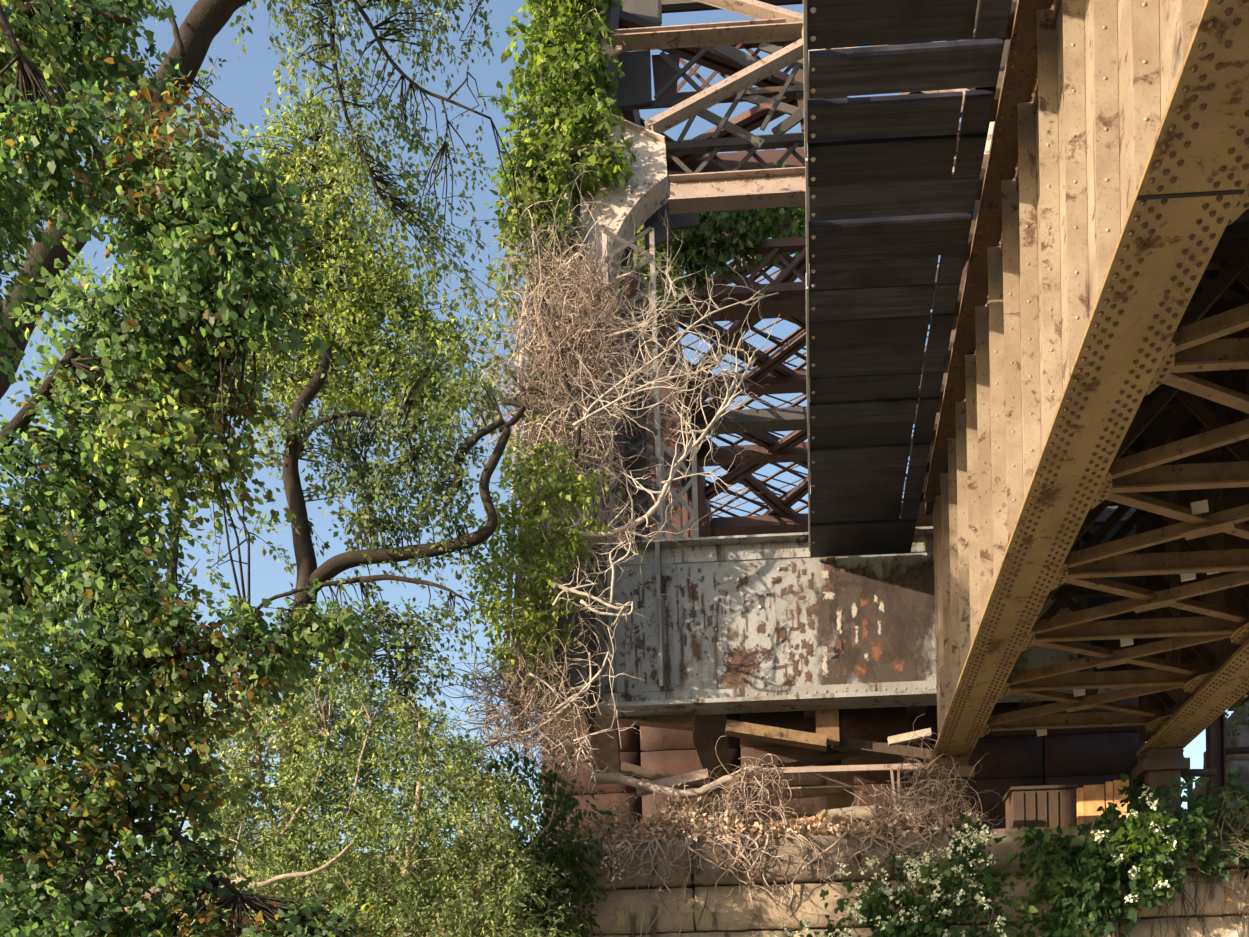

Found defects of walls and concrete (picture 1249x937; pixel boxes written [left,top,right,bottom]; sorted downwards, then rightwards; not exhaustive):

peeling [630,569,647,688]
rust [625,574,756,697]
peeling [675,556,869,687]
rust [766,557,935,685]